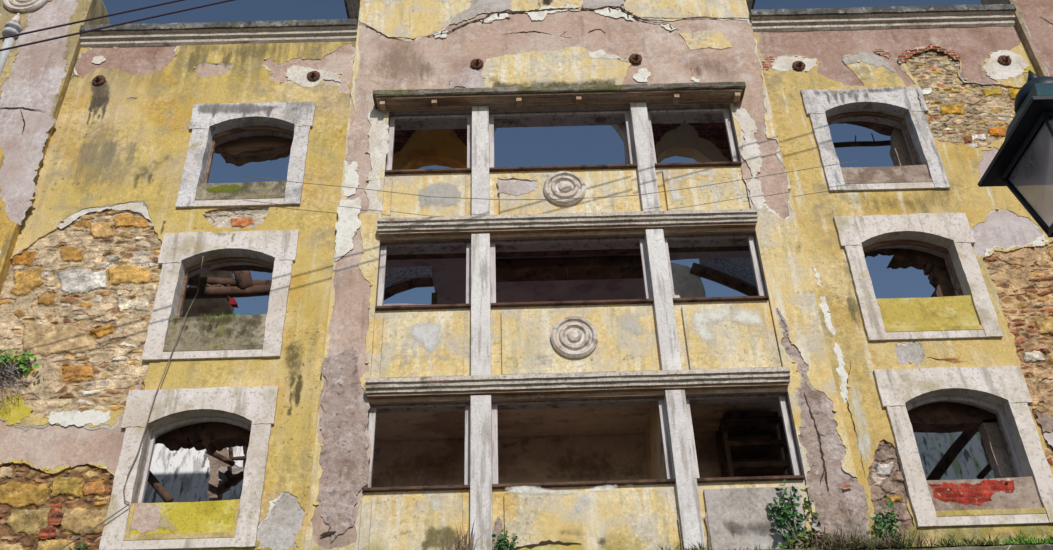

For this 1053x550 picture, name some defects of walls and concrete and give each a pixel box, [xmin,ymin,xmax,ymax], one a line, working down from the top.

crack [2,107,42,132]
peeling [0,0,179,225]
spalling [0,208,162,550]
leakage [286,344,302,415]
peeling [261,0,1053,550]